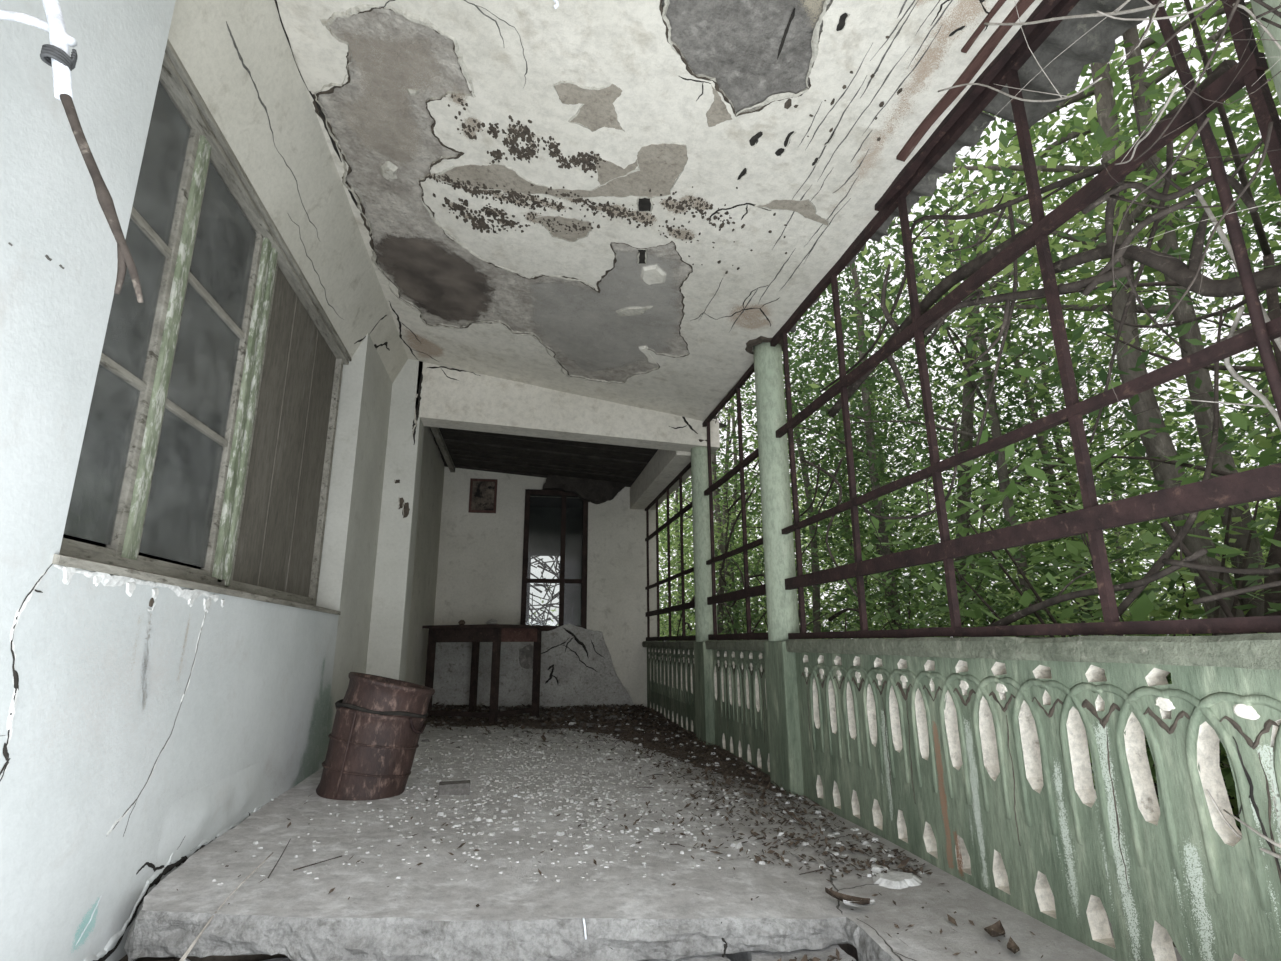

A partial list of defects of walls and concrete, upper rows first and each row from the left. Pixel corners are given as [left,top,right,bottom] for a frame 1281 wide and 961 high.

crack [226,0,481,444]
damp [374,231,497,323]
peeling [312,4,745,384]
peeling [659,0,850,127]
crack [690,0,989,331]
crack [0,564,52,782]
crack [106,611,207,837]
crack [84,797,278,961]
crack [720,922,728,958]
crack [1232,736,1281,873]